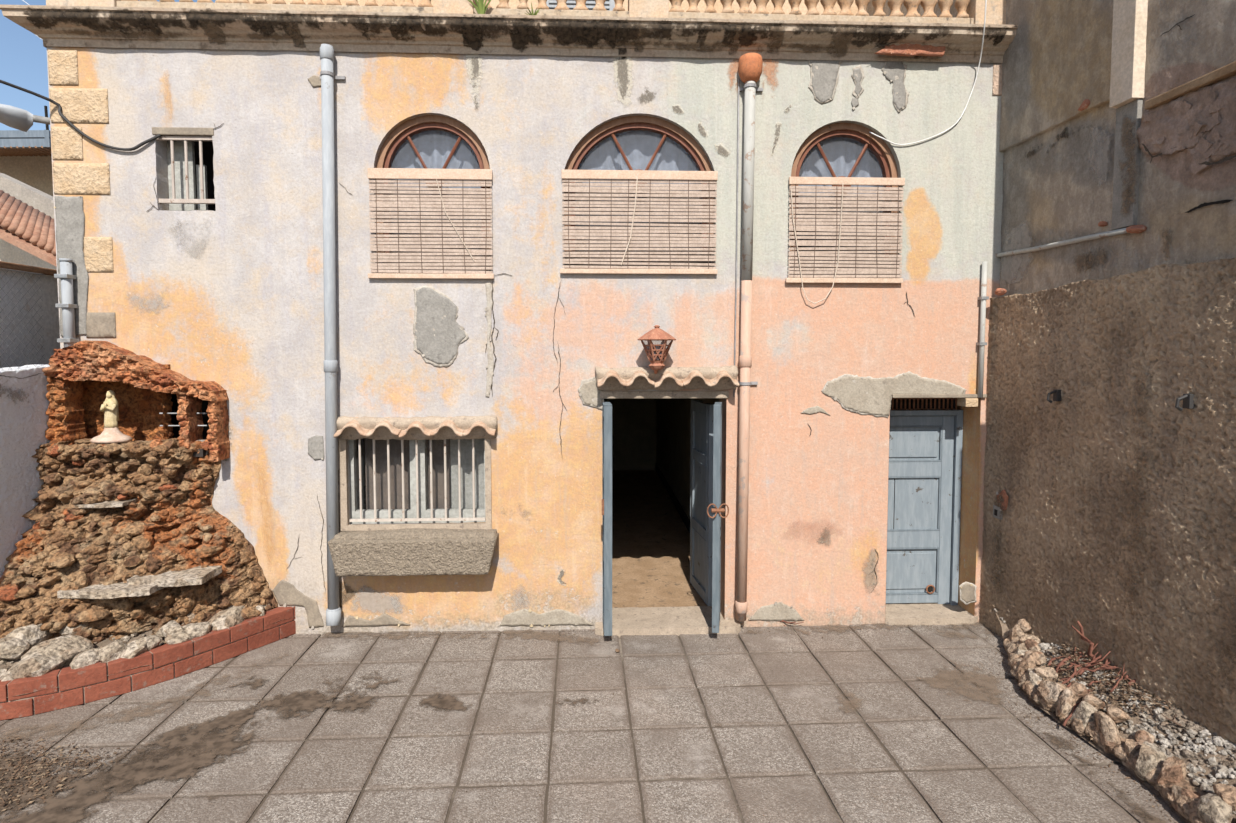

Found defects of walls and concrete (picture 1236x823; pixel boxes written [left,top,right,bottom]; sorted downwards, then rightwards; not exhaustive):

leakage [24,7,951,108]
mould [969,26,1017,45]
spalling [1136,76,1236,175]
crack [485,273,512,395]
crack [553,280,566,453]
flaking render [272,579,324,629]
flaking render [342,613,410,627]
flaking render [748,602,804,621]